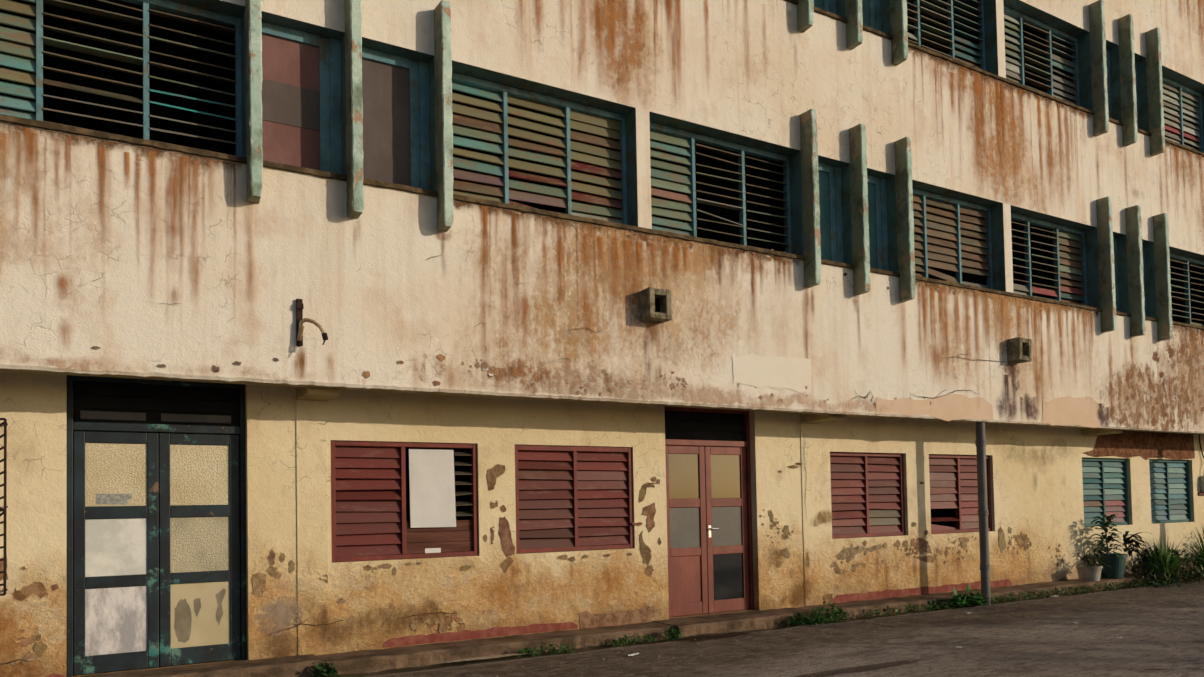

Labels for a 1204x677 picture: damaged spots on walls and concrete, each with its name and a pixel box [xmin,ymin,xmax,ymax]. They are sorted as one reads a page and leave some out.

peeling [1083,342,1204,460]
corrosion [1100,333,1204,431]
peeling [0,555,59,601]
peeling [252,549,296,597]
peeling [483,464,515,573]
peeling [557,553,611,562]
peeling [626,476,661,577]
peeling [830,522,977,575]
peeling [998,526,1032,554]
spalling [8,629,48,666]